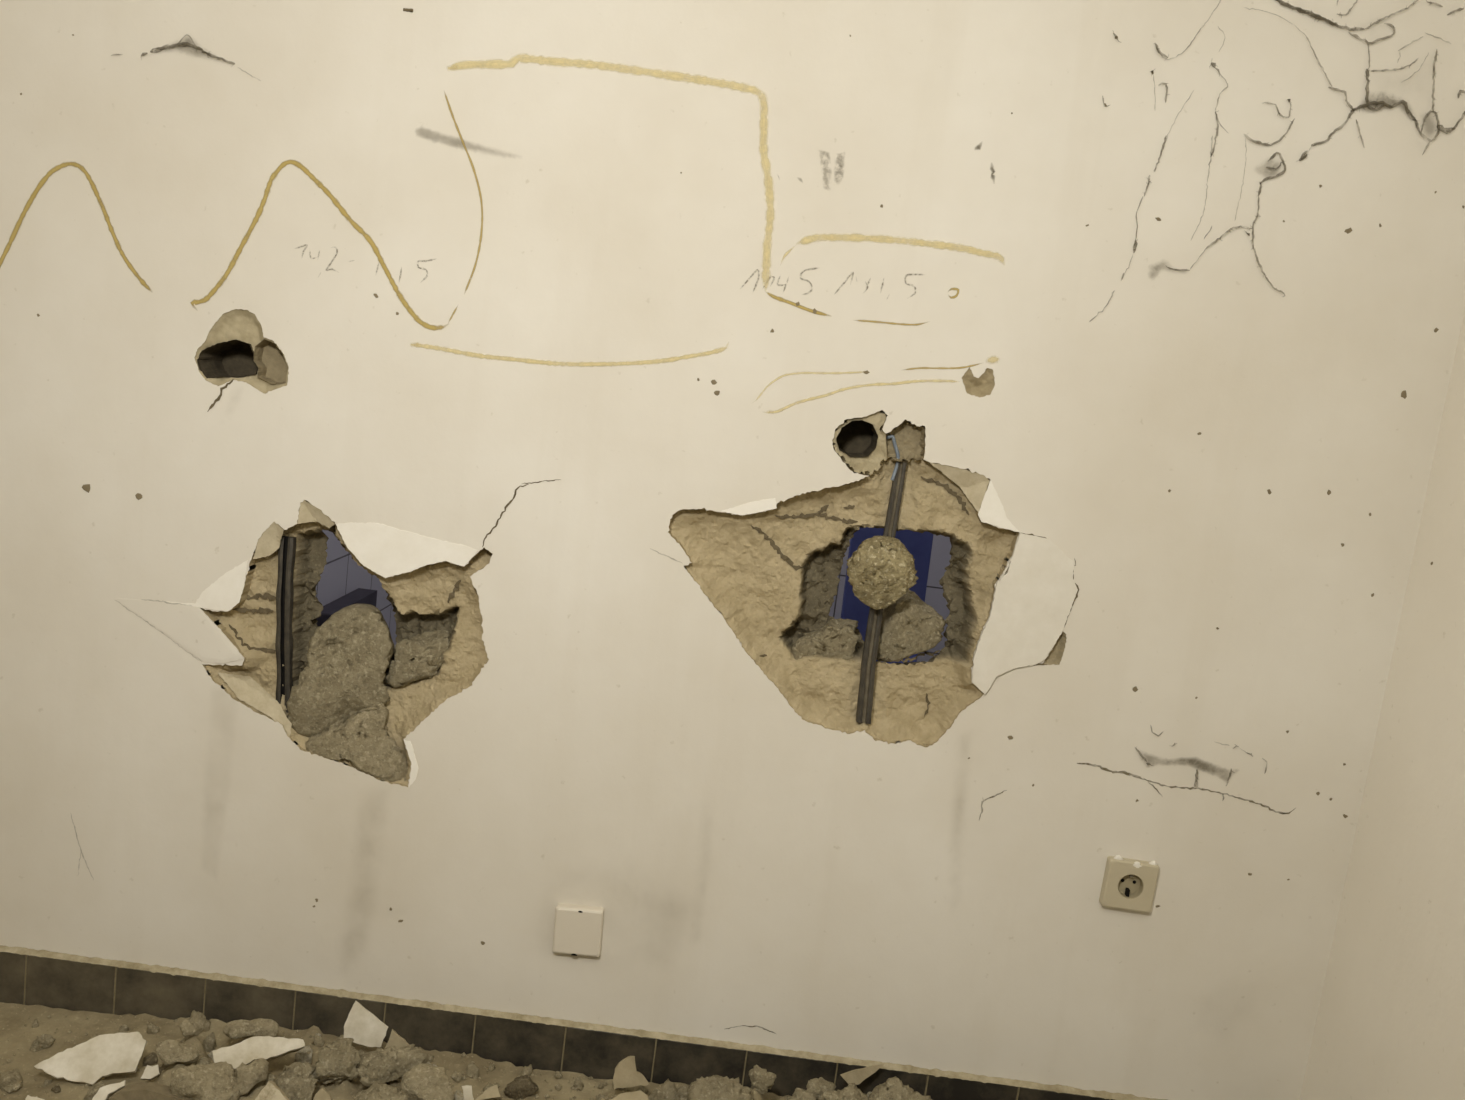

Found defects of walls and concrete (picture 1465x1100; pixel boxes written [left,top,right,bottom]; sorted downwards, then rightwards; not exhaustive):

spalling [195,309,289,394]
crack [482,479,561,547]
flaking render [668,410,1078,747]
flaking render [166,500,493,787]
crack [1077,763,1294,814]